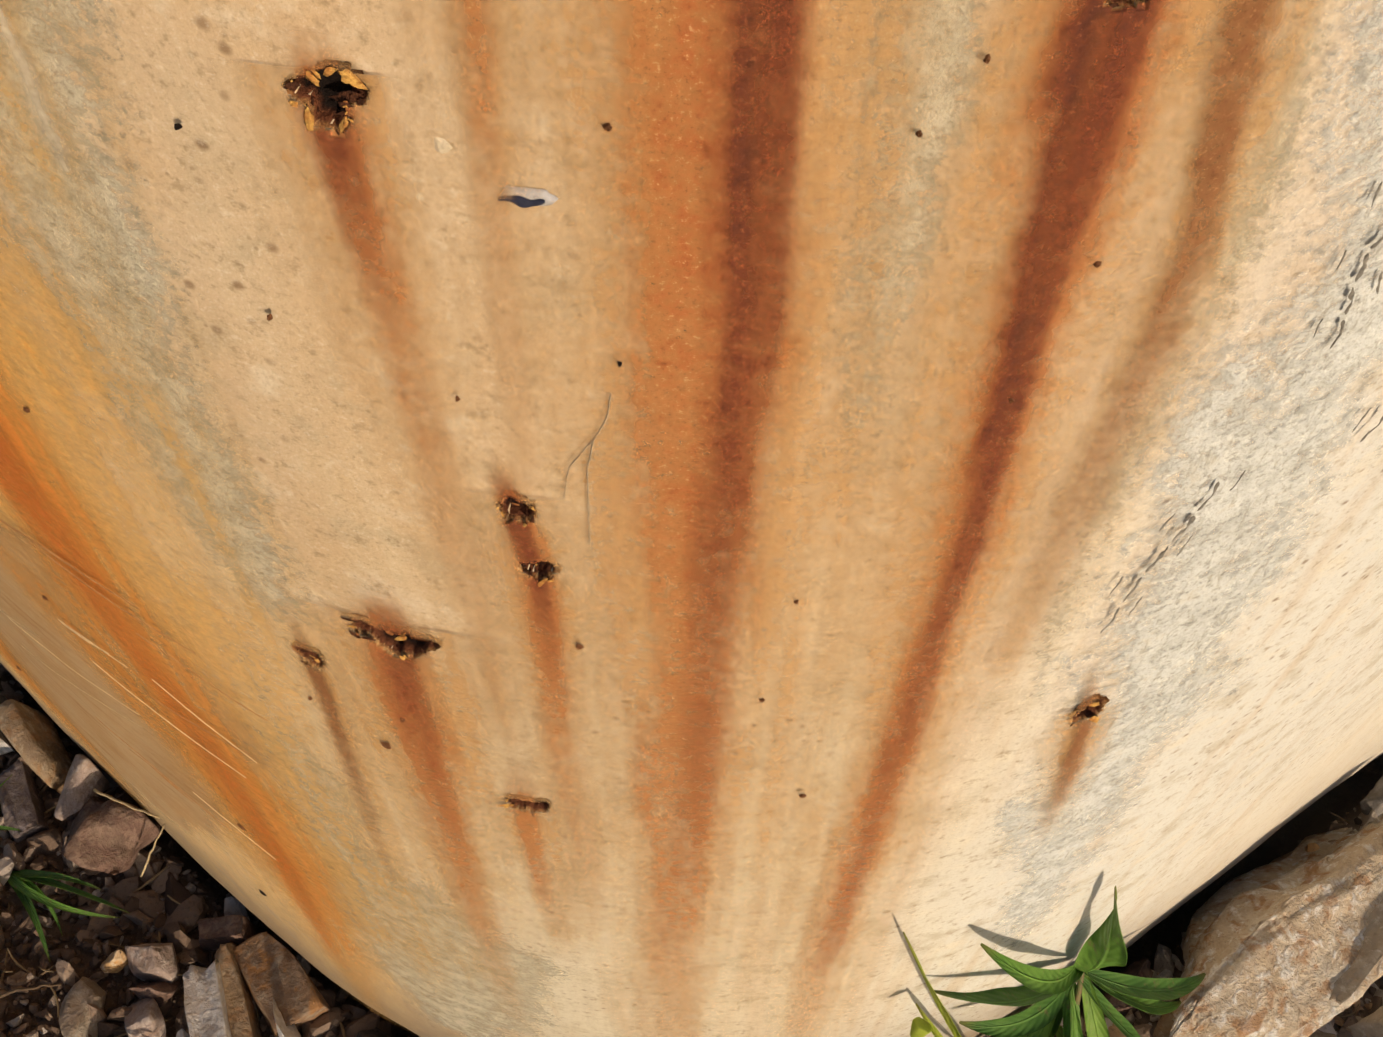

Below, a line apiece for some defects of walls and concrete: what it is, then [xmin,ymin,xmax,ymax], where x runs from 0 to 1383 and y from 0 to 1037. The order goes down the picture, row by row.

corrosion [0,230,493,955]
corrosion [282,74,409,354]
corrosion [481,488,578,741]
corrosion [505,791,561,886]
corrosion [545,0,906,954]
corrosion [819,0,1292,949]